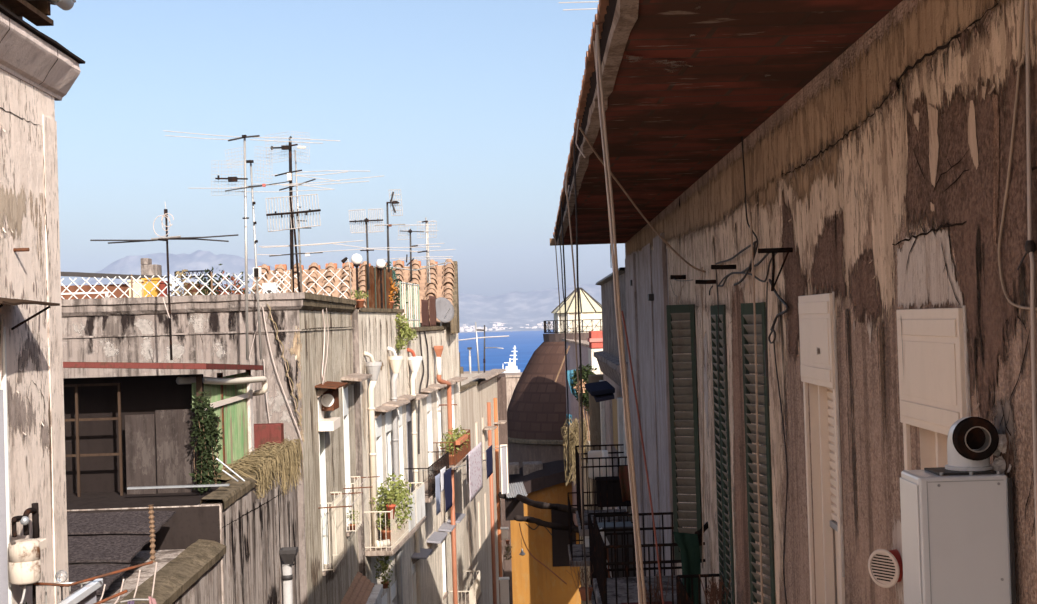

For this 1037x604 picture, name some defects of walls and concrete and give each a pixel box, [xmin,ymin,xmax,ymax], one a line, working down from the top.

peeling [0,185,51,458]
water stain [72,311,245,363]
peeling [747,142,882,360]
crack [781,3,998,175]
crack [913,149,969,192]
peeling [887,45,1037,478]